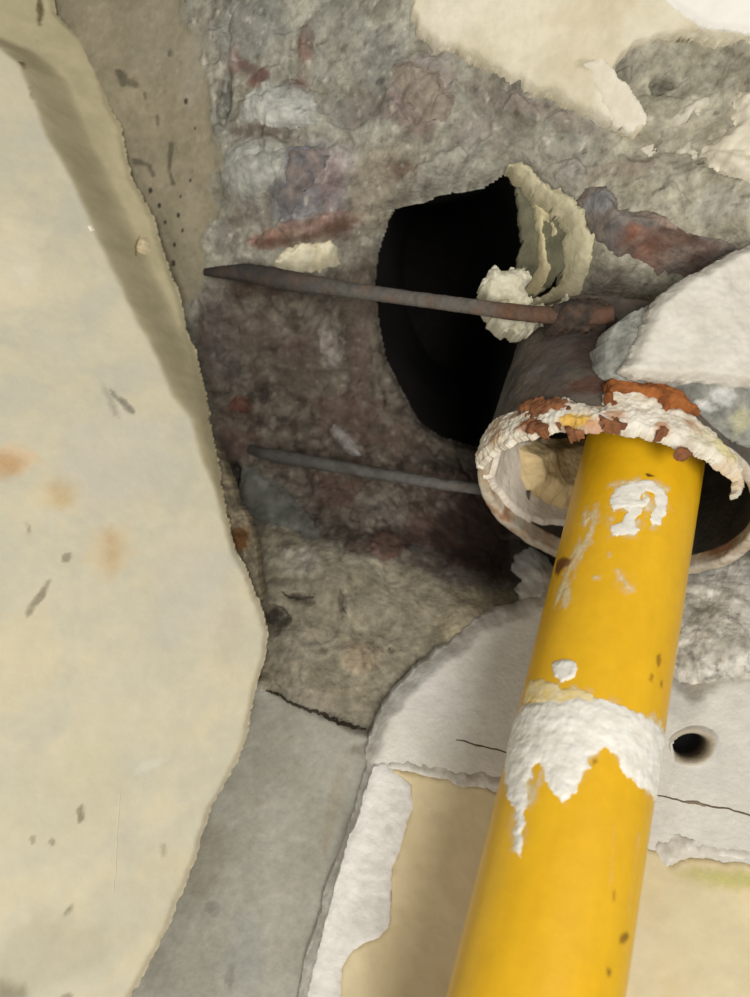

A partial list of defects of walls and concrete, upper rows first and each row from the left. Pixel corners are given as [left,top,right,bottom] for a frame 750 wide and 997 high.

spalling [181,0,750,600]
corrosion [517,396,585,444]
corrosion [598,378,701,435]
corrosion [653,425,669,443]
corrosion [673,447,693,462]
spalling [673,550,750,684]
crack [266,690,366,731]
peeling [655,834,750,866]
peeling [307,761,501,997]